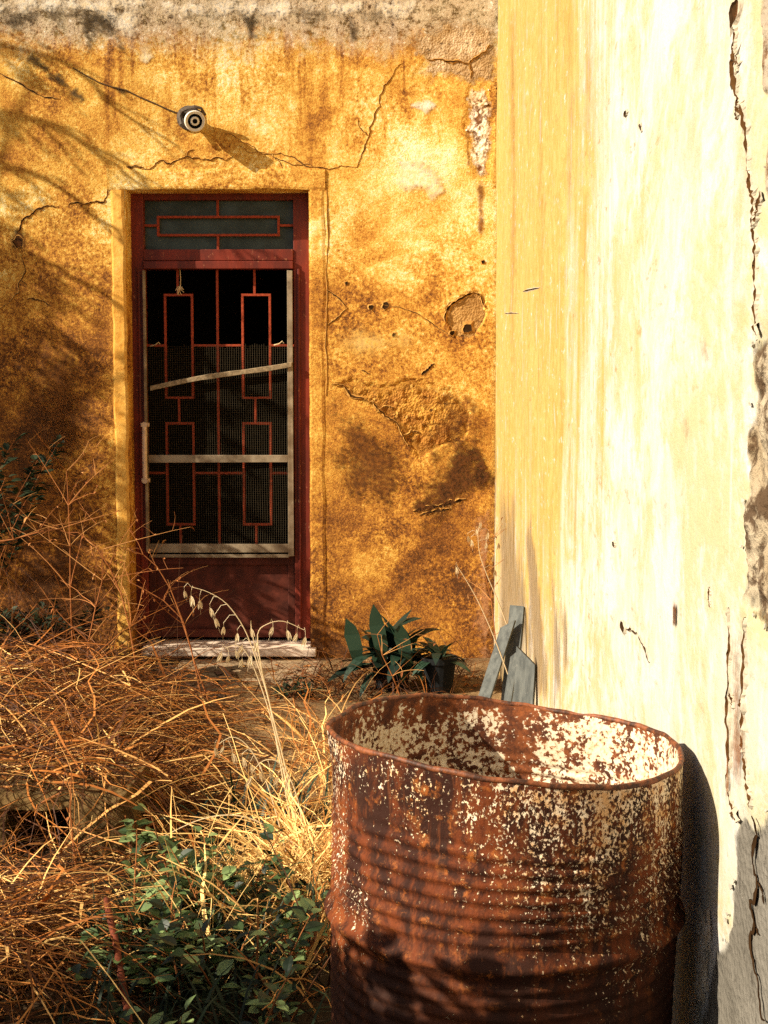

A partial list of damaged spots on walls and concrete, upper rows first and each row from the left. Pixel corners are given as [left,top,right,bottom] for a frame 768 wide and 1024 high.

leakage [0,0,145,49]
leakage [162,0,423,41]
flaking render [411,21,498,174]
crack [0,188,109,309]
crack [126,44,490,394]
spalling [739,339,768,630]
peeling [703,809,768,1024]